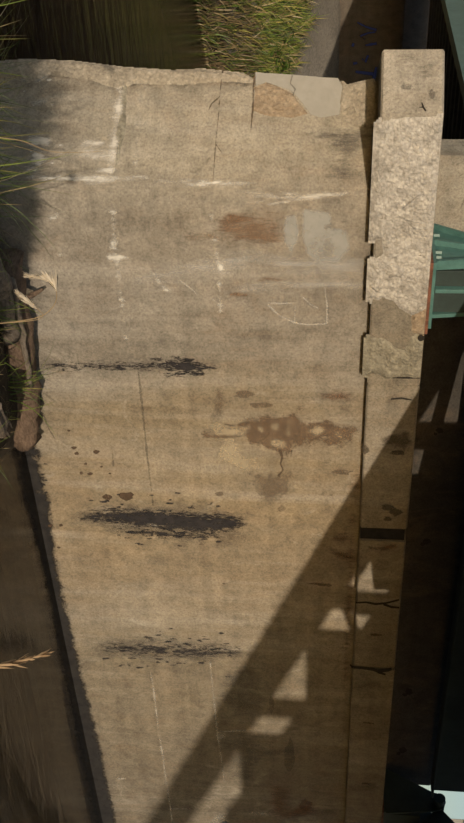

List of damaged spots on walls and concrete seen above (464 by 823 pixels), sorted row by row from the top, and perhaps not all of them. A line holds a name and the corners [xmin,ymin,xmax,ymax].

spalling [0,59,307,167]
water stain [27,137,118,182]
spalling [340,79,443,381]
water stain [51,356,217,377]
water stain [80,492,244,547]
crack [356,599,399,609]
water stain [100,628,238,669]
crack [350,664,392,675]